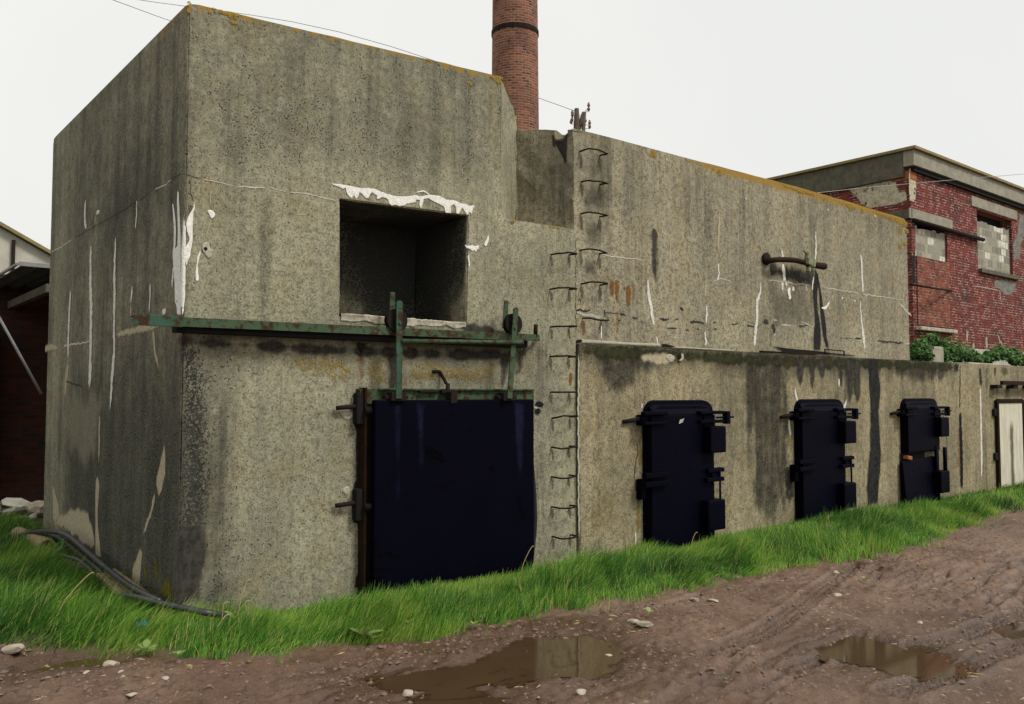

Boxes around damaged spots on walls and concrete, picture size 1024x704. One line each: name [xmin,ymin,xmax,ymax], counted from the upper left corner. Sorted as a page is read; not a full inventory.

peeling [843,168,916,249]
corrosion [610,280,634,306]
water stain [244,341,535,388]
water stain [568,229,959,544]
water stain [979,368,1007,477]
water stain [175,335,231,604]
peeling [52,477,101,557]